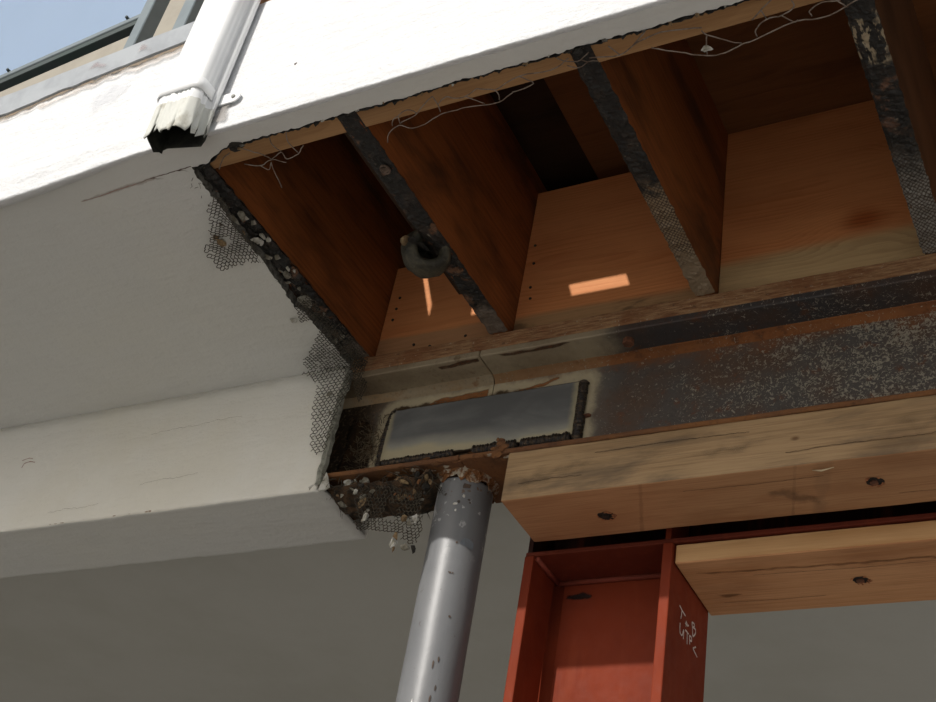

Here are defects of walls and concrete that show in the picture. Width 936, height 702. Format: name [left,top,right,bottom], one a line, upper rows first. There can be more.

crack [82,166,191,202]
spalling [191,164,366,357]
spalling [308,368,471,525]